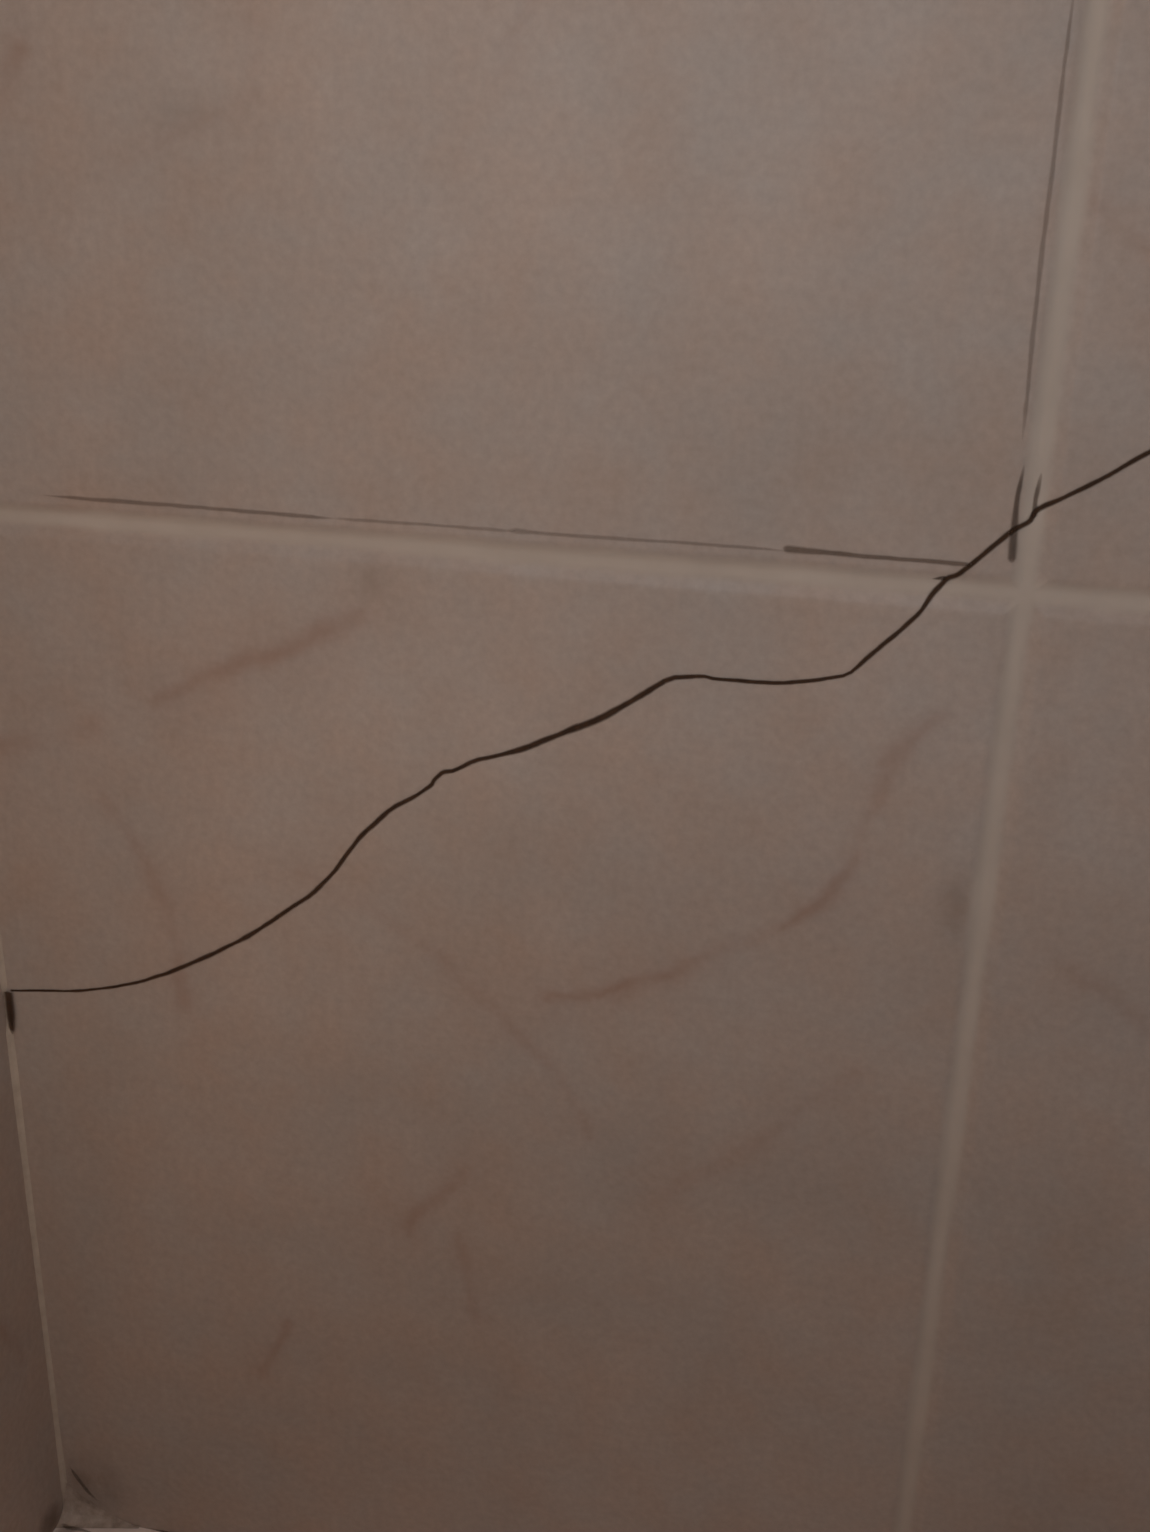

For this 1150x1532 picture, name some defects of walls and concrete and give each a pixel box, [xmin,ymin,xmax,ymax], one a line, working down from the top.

crack [4,450,1150,1032]